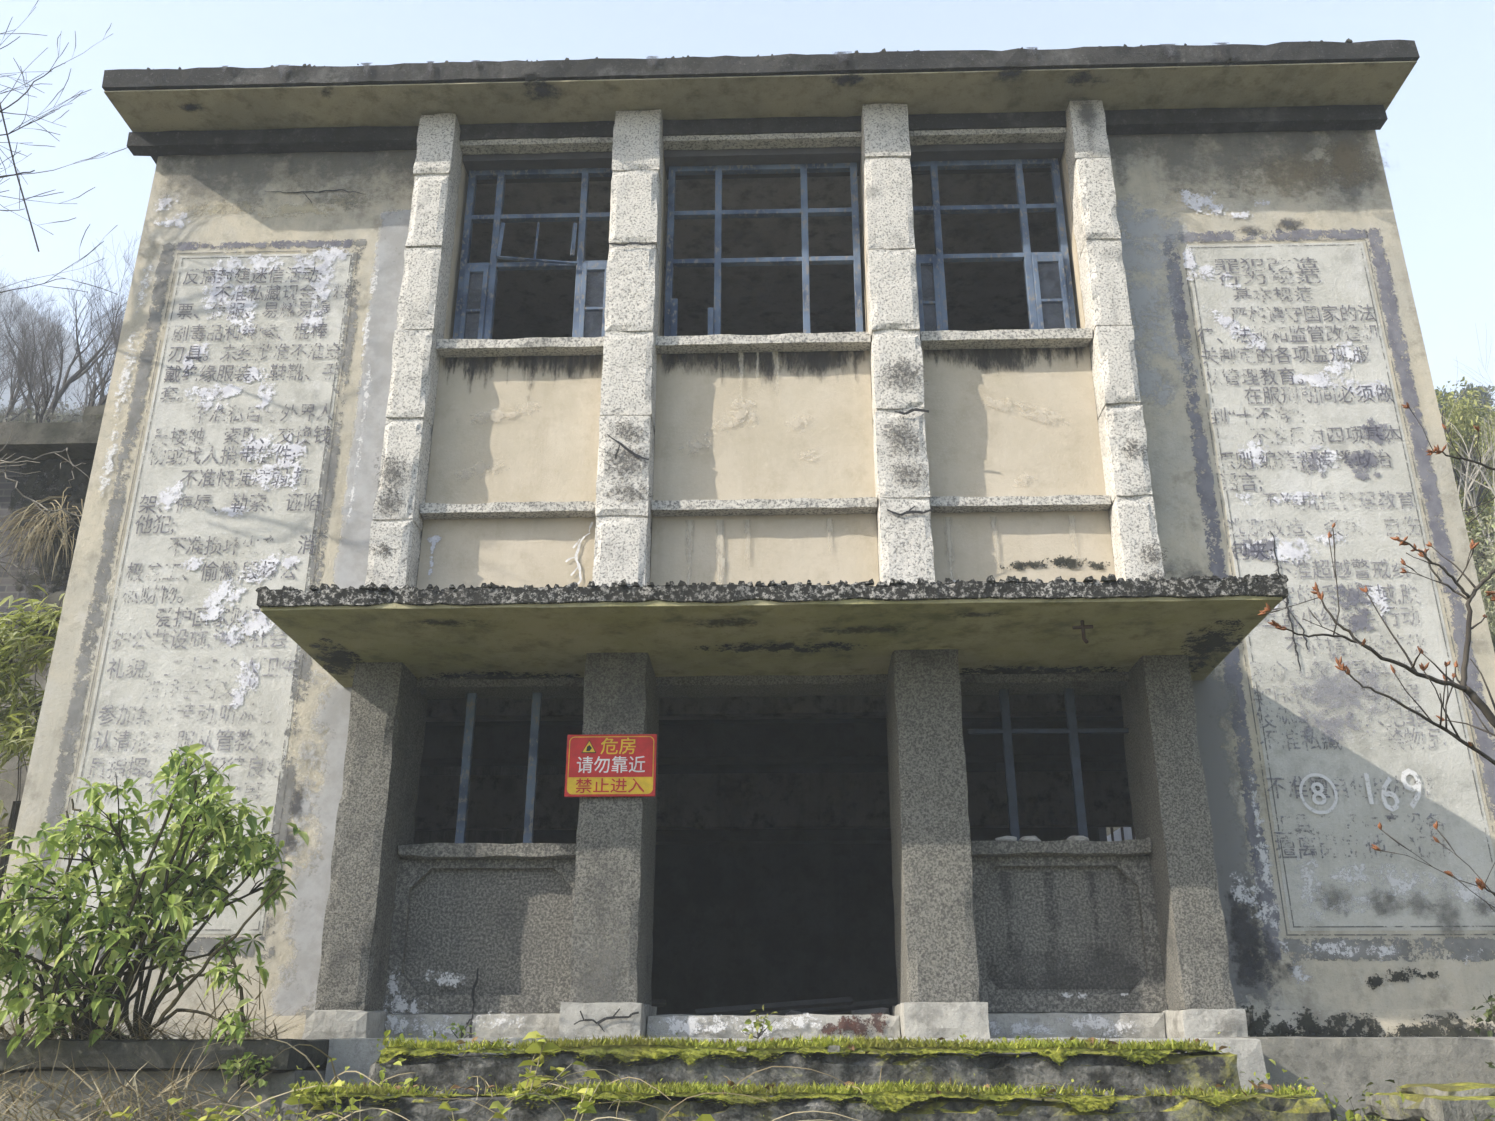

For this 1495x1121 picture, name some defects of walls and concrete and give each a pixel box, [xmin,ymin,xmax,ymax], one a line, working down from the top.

peeling [1179,189,1270,219]
peeling [201,244,349,337]
water stain [445,355,602,384]
water stain [661,351,864,383]
water stain [924,347,1085,370]
peeling [179,556,209,571]
water stain [717,520,725,584]
water stain [991,515,1110,570]
peeling [199,553,300,710]
water stain [1230,760,1440,990]
water stain [1295,843,1495,932]
water stain [1229,1003,1495,1037]